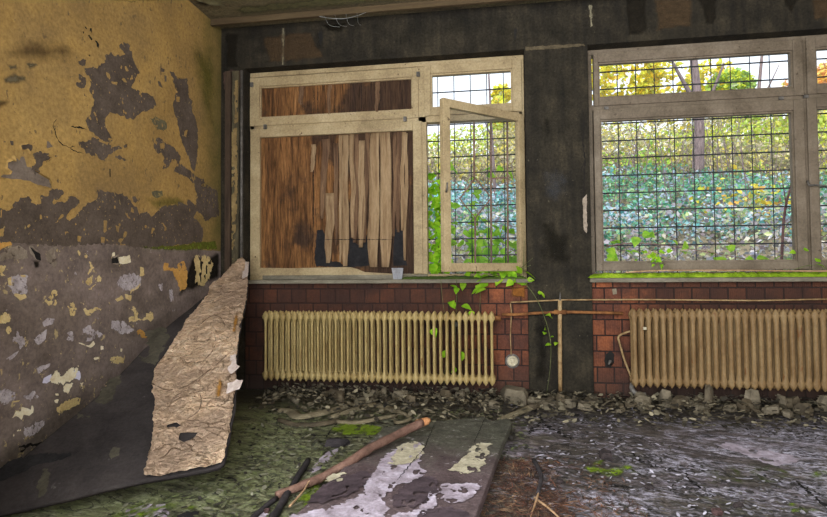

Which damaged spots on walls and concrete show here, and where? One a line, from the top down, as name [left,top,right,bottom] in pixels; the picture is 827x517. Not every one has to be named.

peeling [0,42,219,265]
peeling [115,267,153,320]